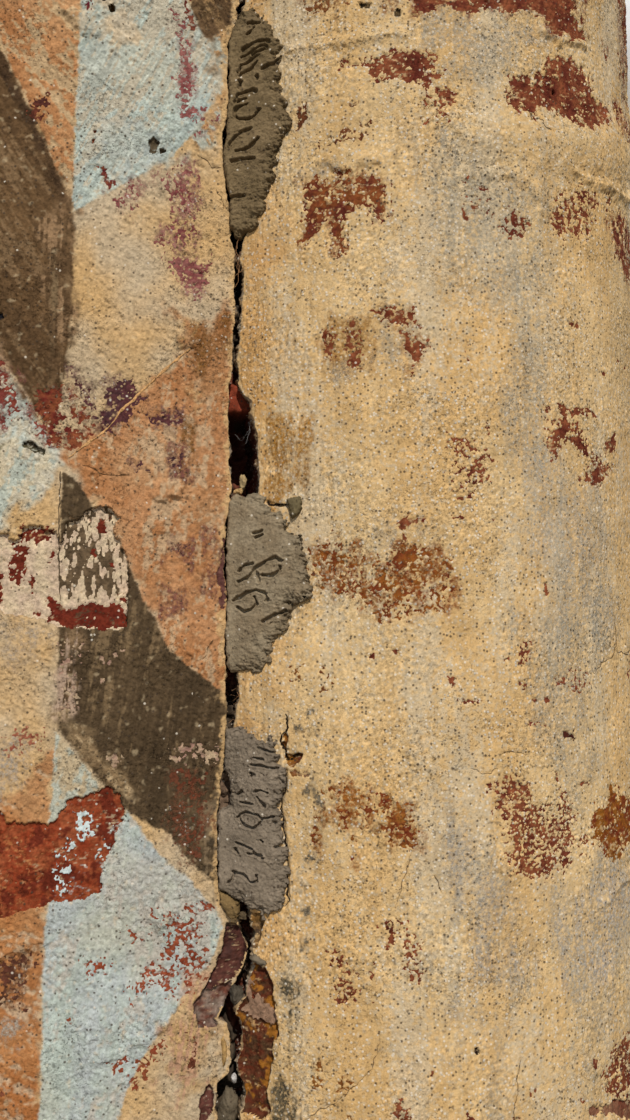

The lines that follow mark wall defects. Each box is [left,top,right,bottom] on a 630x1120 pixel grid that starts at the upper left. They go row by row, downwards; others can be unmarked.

crack [199,46,287,728]
crack [217,757,232,834]
crack [280,714,299,906]
peeling [78,956,113,980]
spalling [120,901,279,1120]
crack [215,900,250,1112]